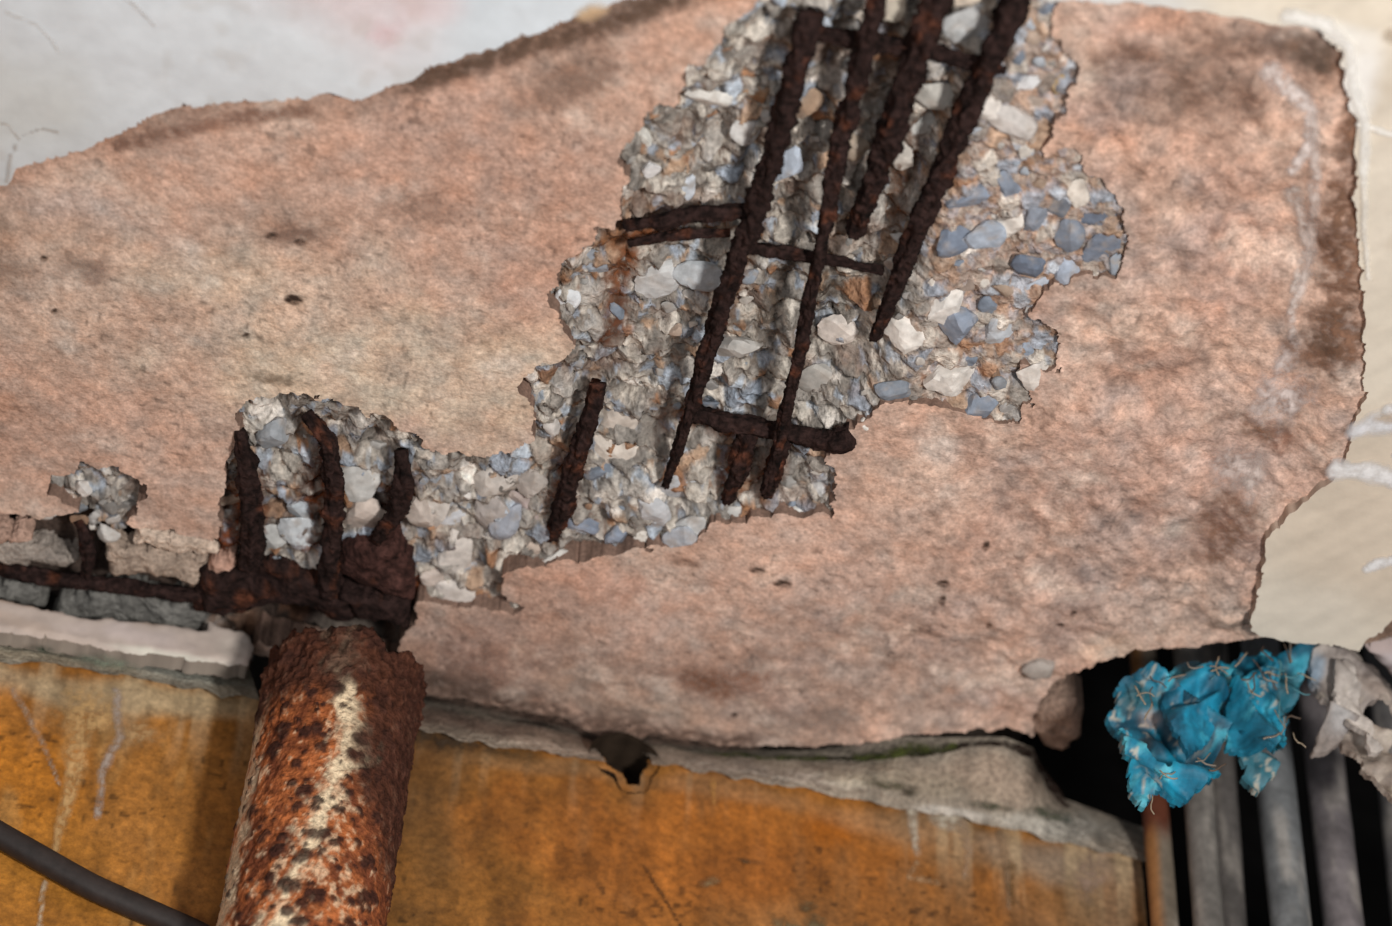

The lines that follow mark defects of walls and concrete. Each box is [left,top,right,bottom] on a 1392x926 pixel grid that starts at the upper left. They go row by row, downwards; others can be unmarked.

spalling [0,0,759,553]
rust [598,0,1031,506]
rust [0,409,420,630]
rust [546,378,607,543]
spalling [200,0,1366,794]
leakage [1328,460,1392,488]
leakage [1363,557,1392,572]